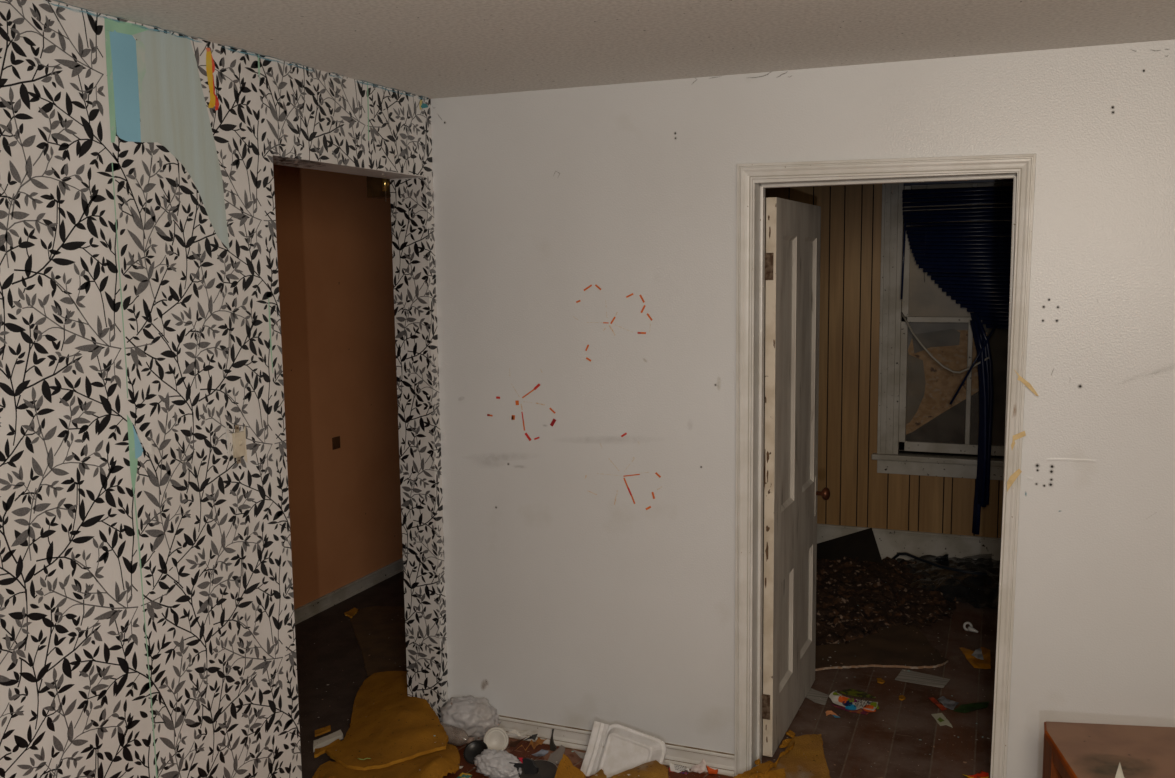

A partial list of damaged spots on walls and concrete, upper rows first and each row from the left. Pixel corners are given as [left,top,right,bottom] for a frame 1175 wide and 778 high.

peeling [206,48,219,110]